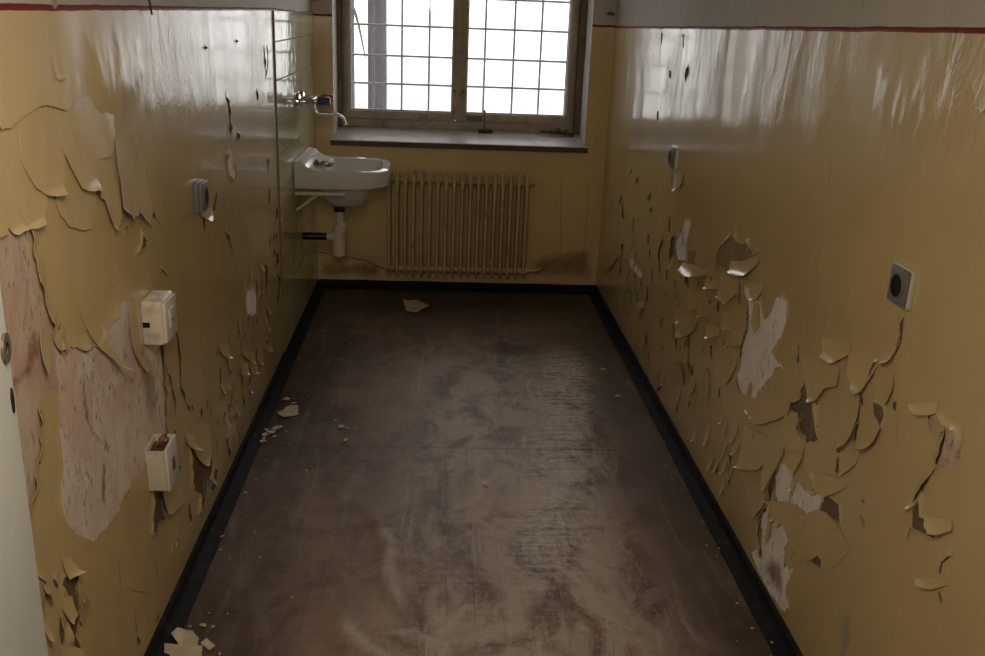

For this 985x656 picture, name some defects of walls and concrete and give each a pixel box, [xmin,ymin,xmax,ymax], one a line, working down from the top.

peeling [0,34,240,549]
peeling [216,234,281,422]
peeling [277,405,298,417]
peeling [614,213,965,617]
peeling [36,556,92,656]